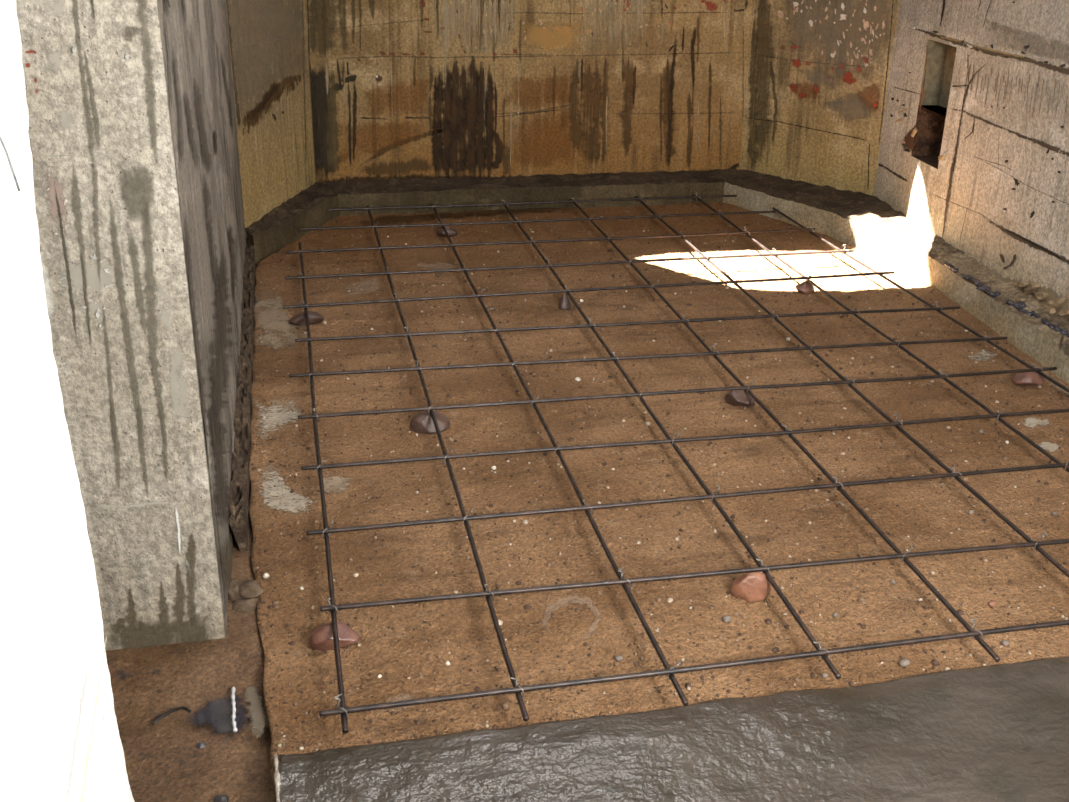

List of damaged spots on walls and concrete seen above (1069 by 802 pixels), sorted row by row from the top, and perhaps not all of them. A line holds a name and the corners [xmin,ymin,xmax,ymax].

damp [73,0,100,150]
damp [126,0,157,152]
damp [174,52,217,171]
damp [221,0,522,182]
damp [570,27,636,174]
damp [659,0,722,172]
damp [729,0,777,169]
peeling [778,0,890,120]
damp [56,170,168,492]
damp [185,183,236,526]
damp [256,398,301,437]
damp [259,465,314,514]